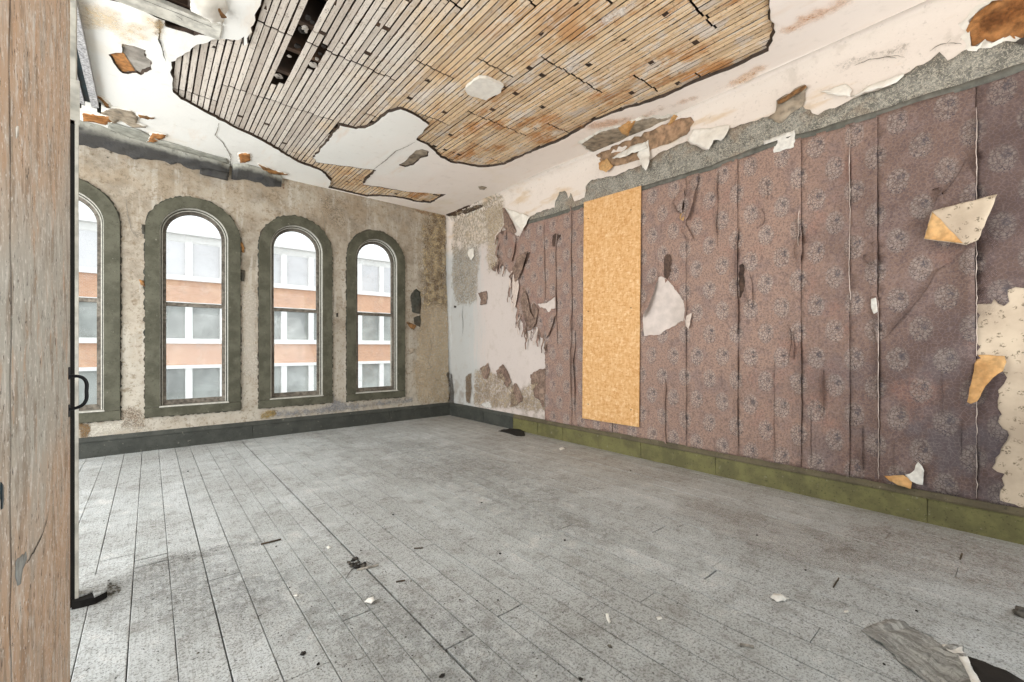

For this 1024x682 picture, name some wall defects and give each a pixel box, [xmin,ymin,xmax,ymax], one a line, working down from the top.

spalling [959,0,1024,51]
flaking render [151,0,775,203]
flaking render [768,85,808,123]
peeling [821,73,904,97]
peeling [446,186,530,308]